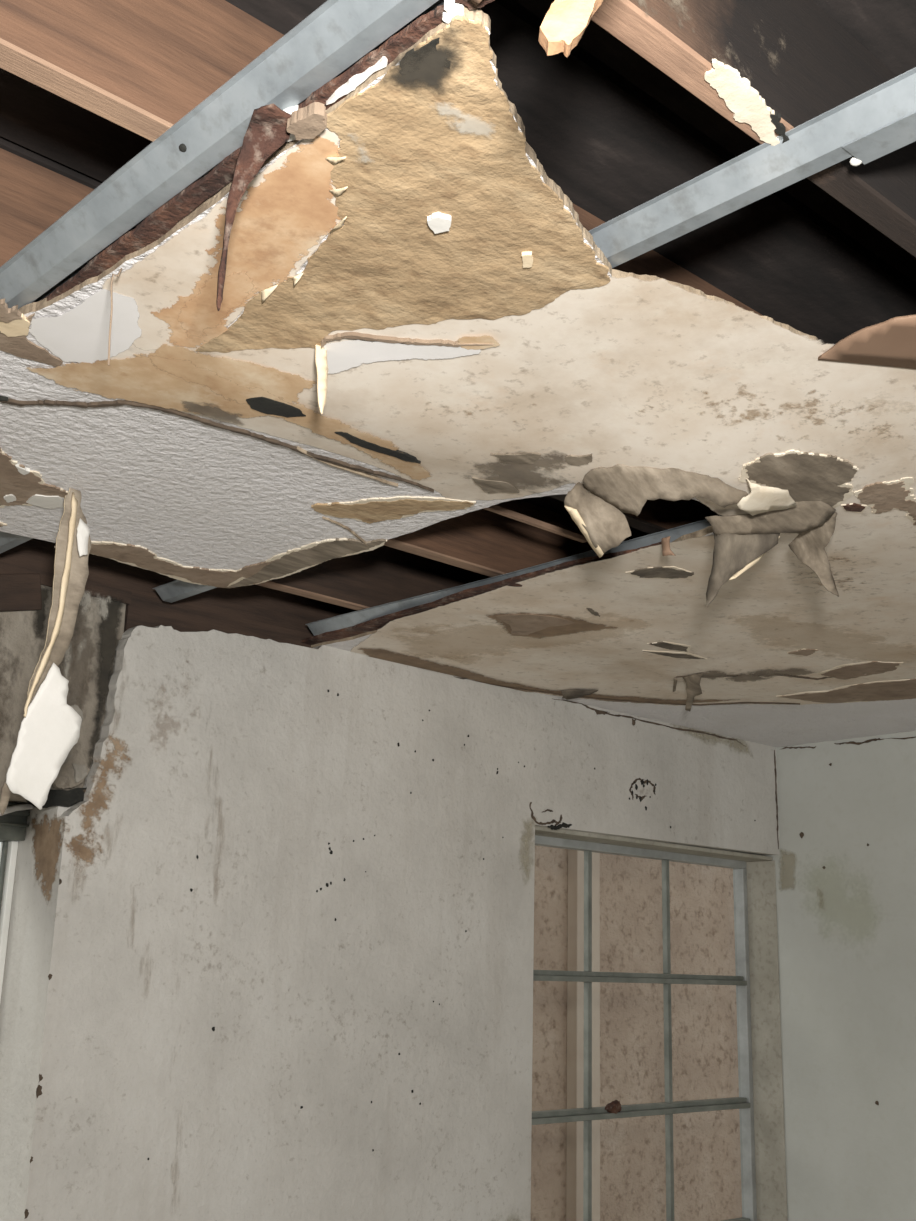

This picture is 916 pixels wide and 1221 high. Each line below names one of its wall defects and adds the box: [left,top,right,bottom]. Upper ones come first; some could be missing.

peeling [196,17,611,353]
peeling [0,289,142,367]
crack [0,395,434,492]
leakage [26,130,916,706]
peeling [0,447,69,527]
peeling [89,538,387,588]
crack [322,516,367,545]
peeling [311,496,476,524]
peeling [625,566,694,579]
leakage [81,593,122,774]